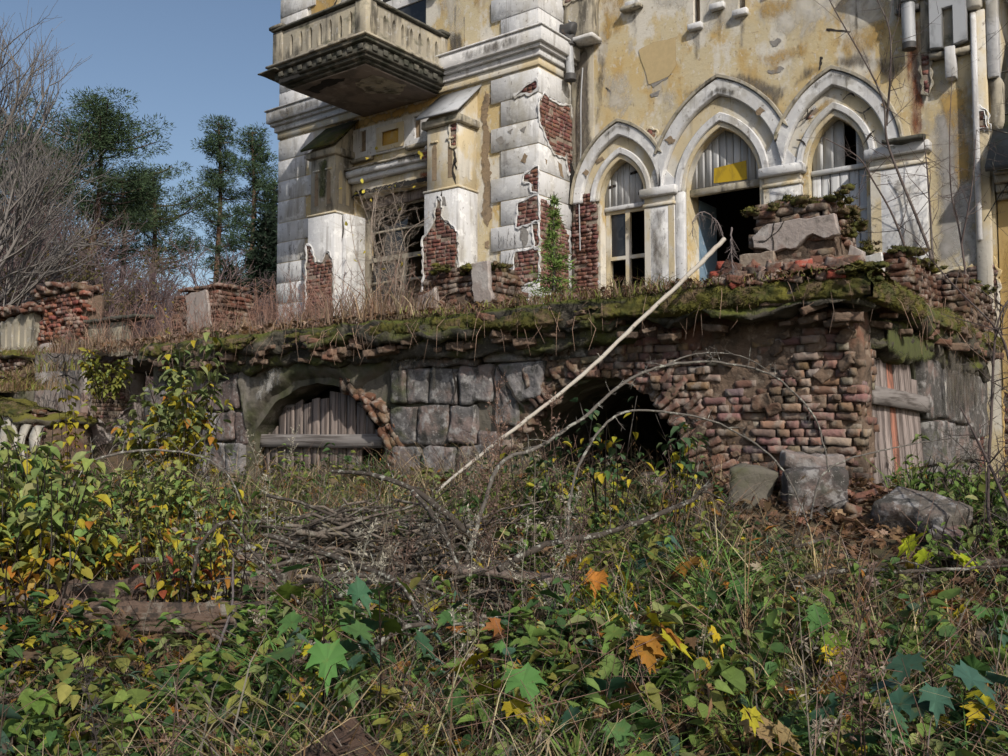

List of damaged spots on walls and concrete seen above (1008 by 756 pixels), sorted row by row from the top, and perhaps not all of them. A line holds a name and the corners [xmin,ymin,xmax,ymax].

rust [908,40,923,132]
flaking render [304,243,335,323]
flaking render [421,195,460,292]
flaking render [481,93,526,227]
flaking render [511,77,600,298]
flaking render [566,309,880,485]